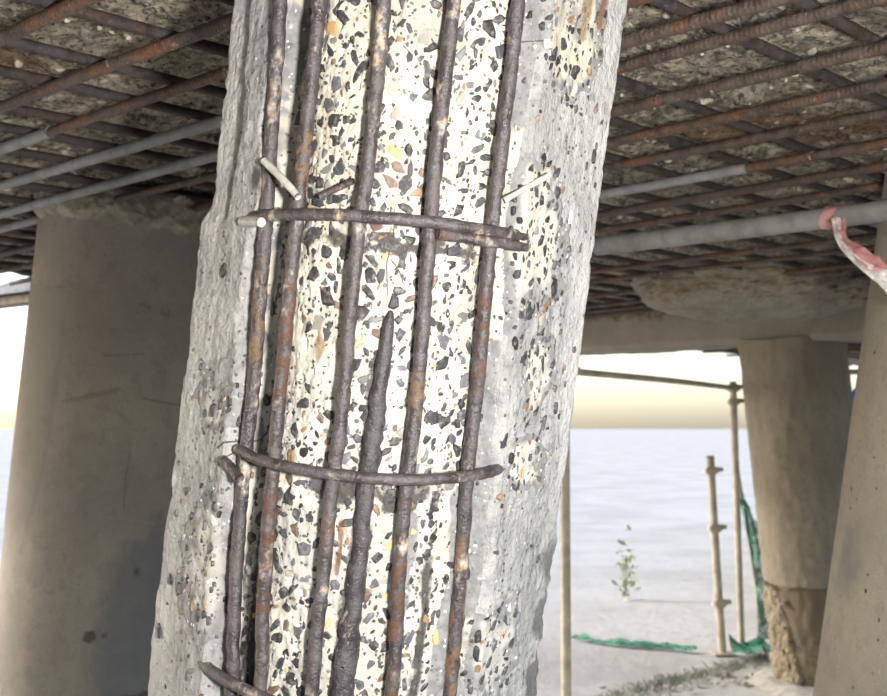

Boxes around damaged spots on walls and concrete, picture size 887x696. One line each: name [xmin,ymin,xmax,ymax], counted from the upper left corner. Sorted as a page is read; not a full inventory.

spalling [51,16,140,51]
spalling [13,53,45,71]
spalling [651,53,754,86]
spalling [785,74,840,92]
spalling [27,132,128,164]
spalling [584,304,679,325]